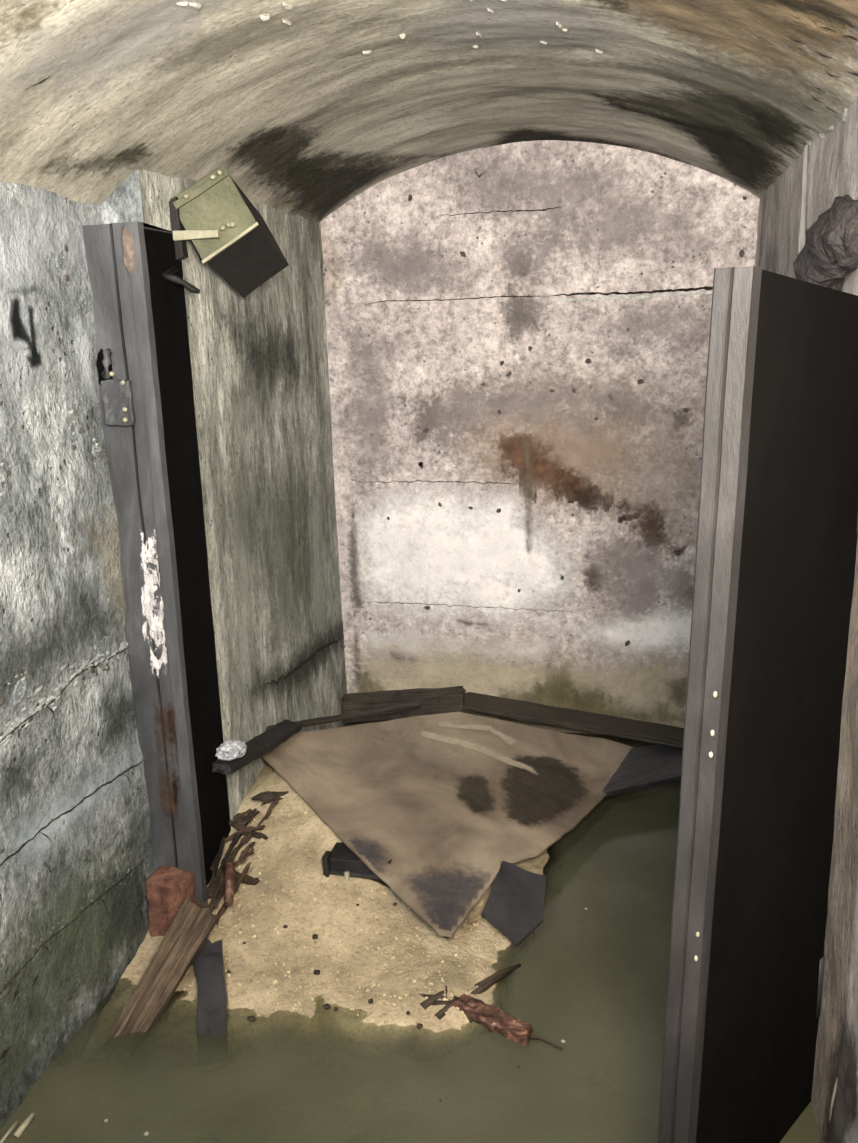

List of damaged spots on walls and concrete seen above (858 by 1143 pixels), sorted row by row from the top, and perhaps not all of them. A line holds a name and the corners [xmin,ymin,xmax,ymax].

damp [234,127,443,221]
damp [355,237,450,292]
damp [474,157,707,277]
damp [414,0,858,254]
damp [352,342,391,474]
damp [416,393,577,442]
rust [499,427,624,523]
damp [350,485,693,728]
damp [466,711,603,735]